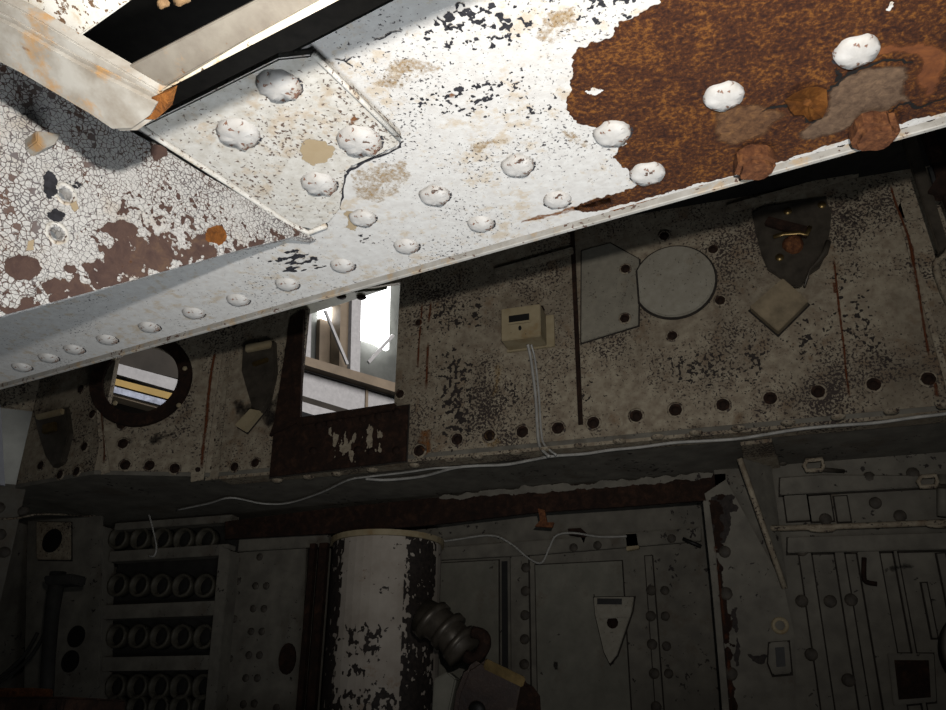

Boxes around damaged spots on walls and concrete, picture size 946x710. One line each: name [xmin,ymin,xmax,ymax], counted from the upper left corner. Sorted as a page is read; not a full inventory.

peeling [403,0,565,127]
peeling [577,0,636,25]
rust [522,0,946,222]
crack [340,141,404,209]
rust [0,219,299,315]
peeling [320,536,436,710]